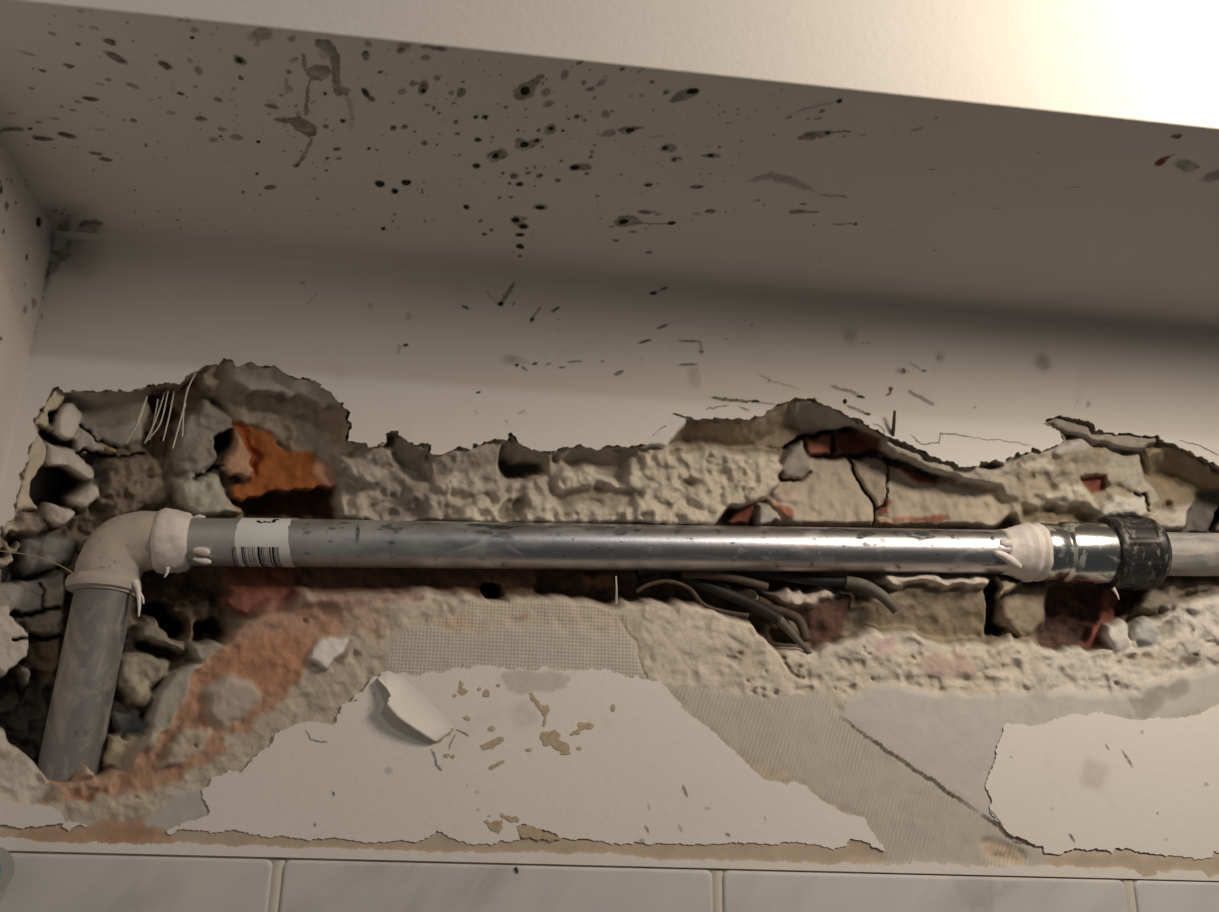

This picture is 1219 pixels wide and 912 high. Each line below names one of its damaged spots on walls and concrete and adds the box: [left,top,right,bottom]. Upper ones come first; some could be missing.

spalling [0,359,1219,884]